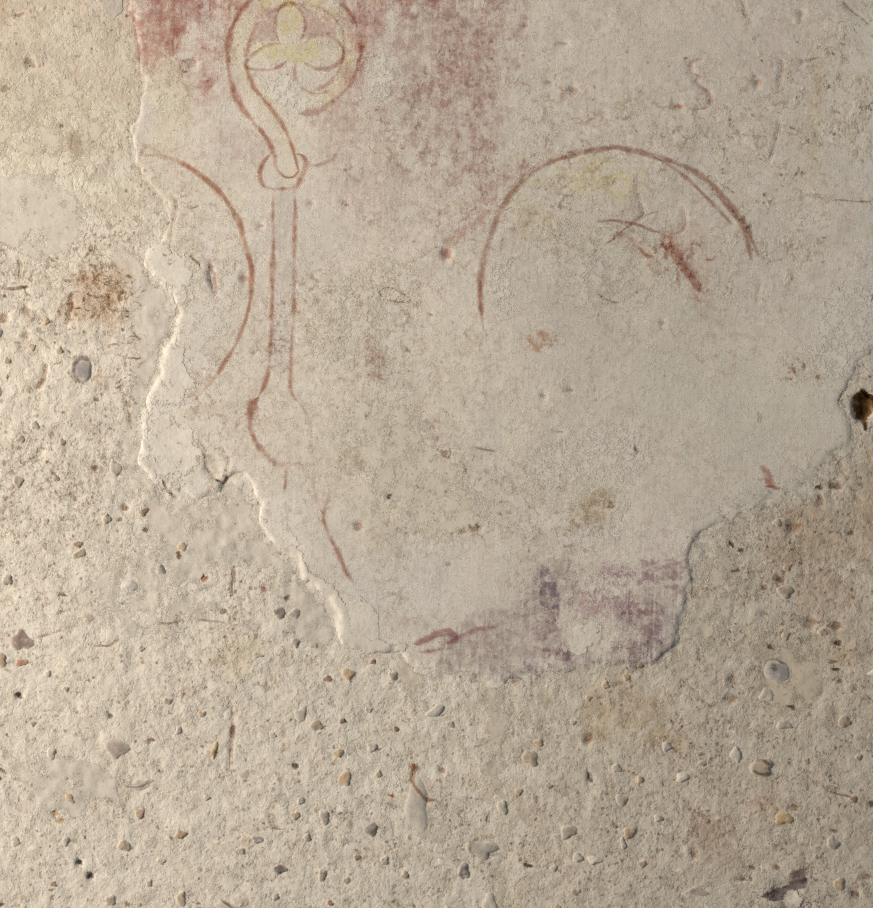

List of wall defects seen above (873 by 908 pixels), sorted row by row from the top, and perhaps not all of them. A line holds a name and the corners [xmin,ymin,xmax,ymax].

flaking render [133,55,190,118]
flaking render [542,221,691,304]
flaking render [135,242,203,495]
spalling [853,389,873,430]
flaking render [332,396,492,546]
flaking render [455,478,783,688]
spalling [784,890,803,908]